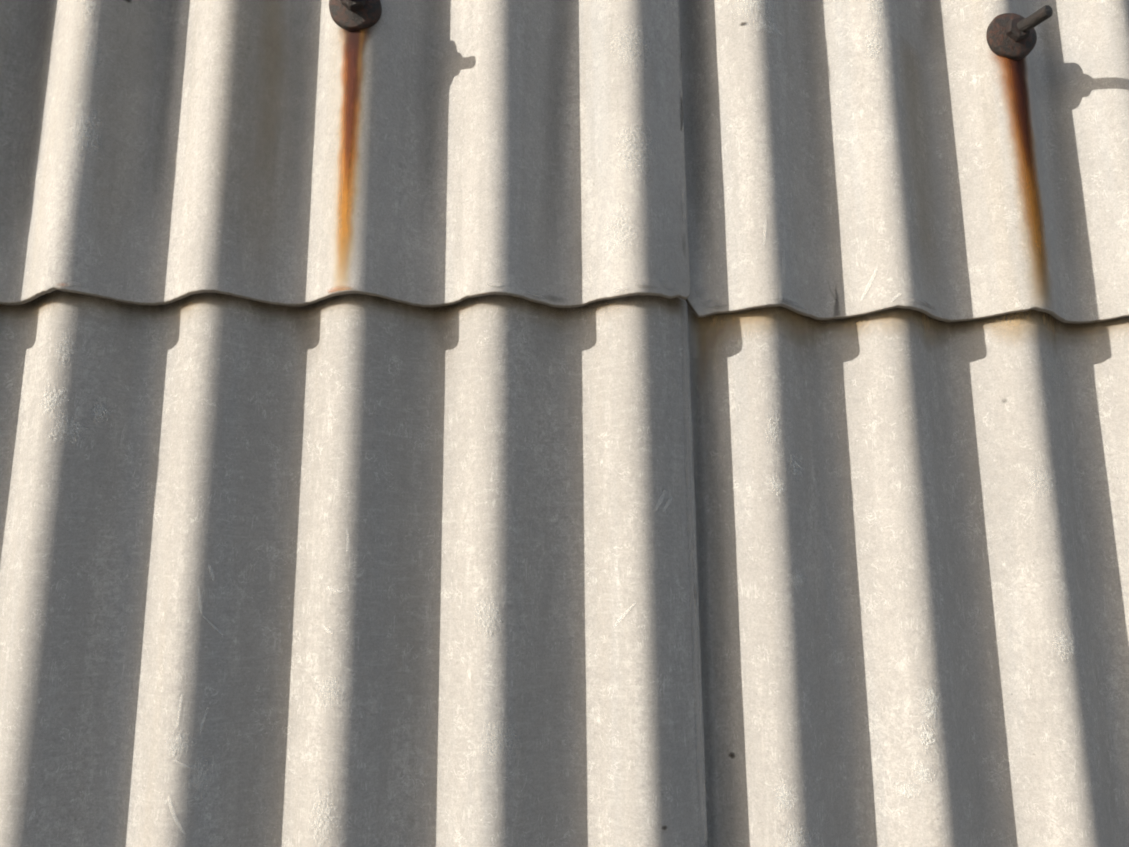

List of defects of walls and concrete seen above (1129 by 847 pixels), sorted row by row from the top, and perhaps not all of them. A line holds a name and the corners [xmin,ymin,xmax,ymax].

corrosion [340,28,366,249]
corrosion [1002,57,1044,264]